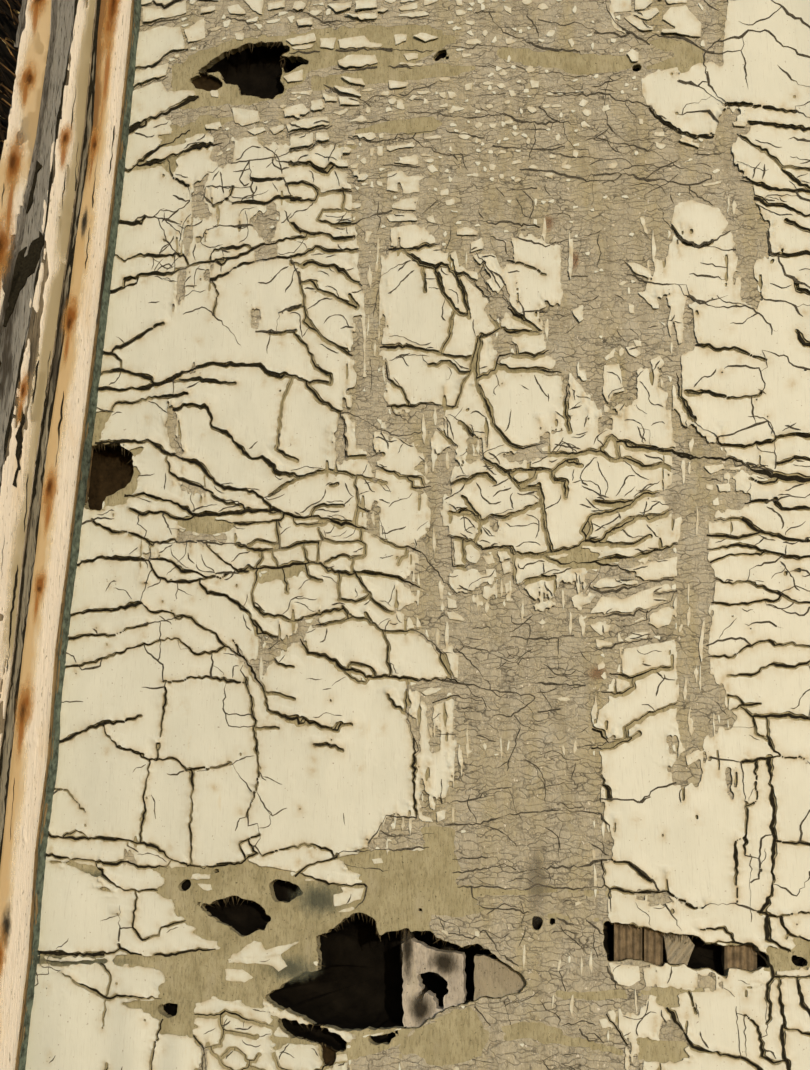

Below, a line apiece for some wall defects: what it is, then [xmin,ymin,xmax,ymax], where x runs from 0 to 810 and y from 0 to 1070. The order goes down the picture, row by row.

corrosion [19,66,36,104]
corrosion [101,0,120,112]
crack [323,0,810,251]
corrosion [0,139,22,281]
peeling [438,267,466,313]
peeling [99,355,150,389]
crack [373,185,810,627]
peeling [0,0,132,1070]
peeling [278,517,364,563]
crack [38,126,617,1018]
corrosion [17,688,31,752]
crack [438,695,810,1070]